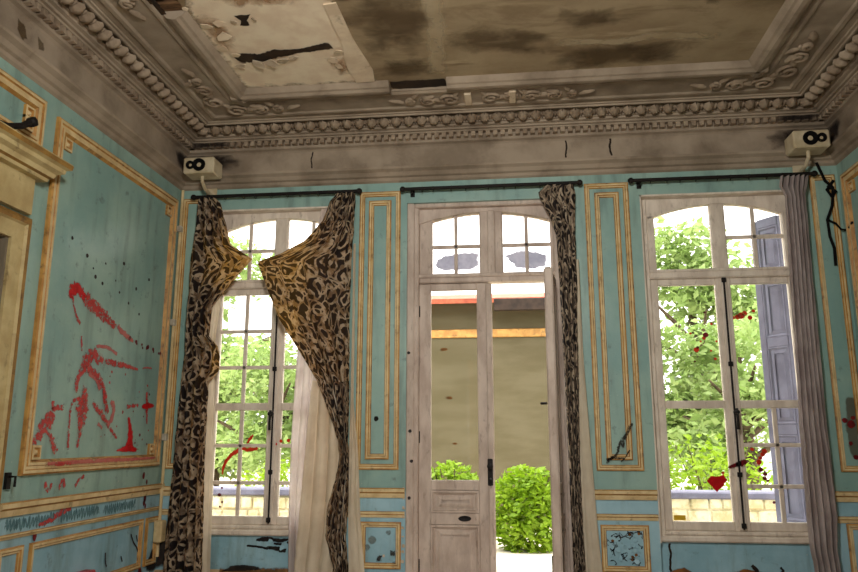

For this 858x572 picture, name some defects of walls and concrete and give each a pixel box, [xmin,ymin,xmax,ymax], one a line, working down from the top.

spalling [147,0,375,88]
peeling [607,531,643,566]